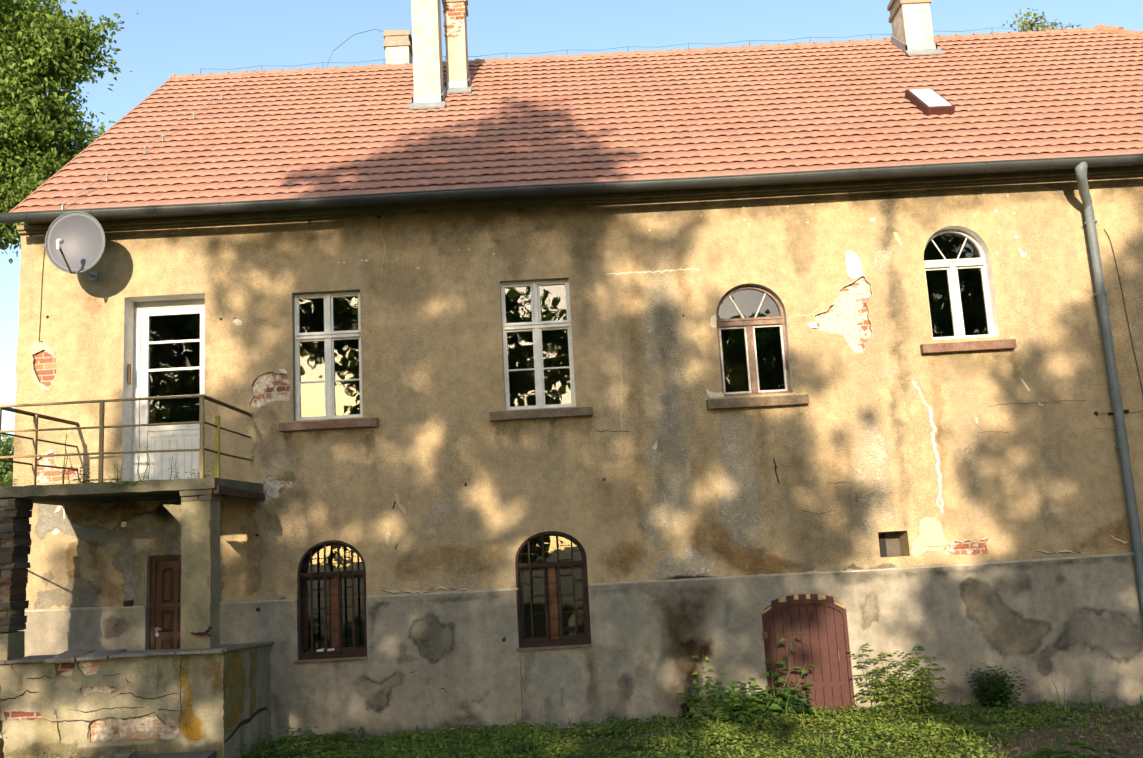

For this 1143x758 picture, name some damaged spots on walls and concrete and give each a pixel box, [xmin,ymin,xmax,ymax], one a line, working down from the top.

spalling [443,2,465,40]
spalling [807,251,874,354]
spalling [30,341,58,391]
spalling [31,449,80,485]
spalling [247,359,292,410]
leakage [607,279,687,569]
crack [911,380,944,514]
leakage [34,500,181,609]
leakage [650,415,785,708]
crack [0,506,213,740]
leakage [409,616,454,663]
spalling [87,711,181,744]